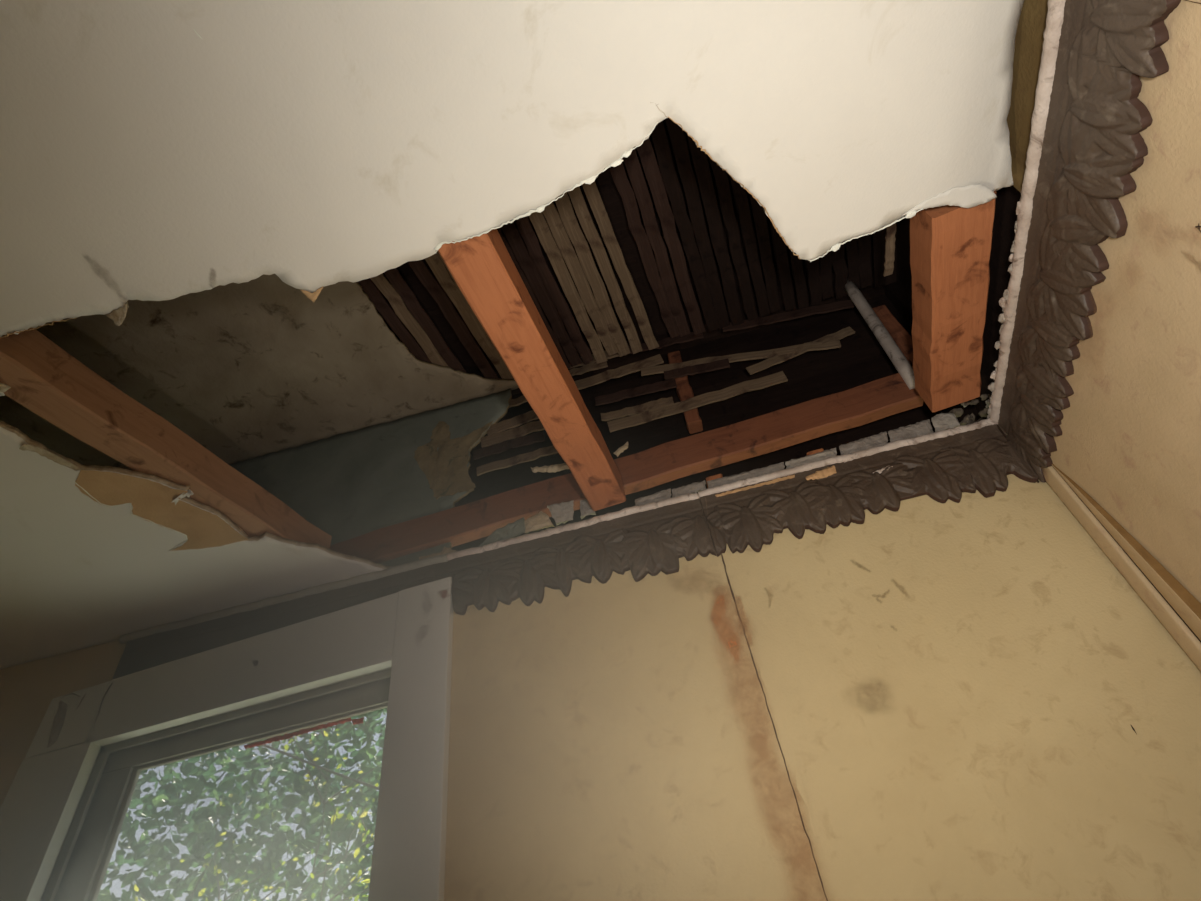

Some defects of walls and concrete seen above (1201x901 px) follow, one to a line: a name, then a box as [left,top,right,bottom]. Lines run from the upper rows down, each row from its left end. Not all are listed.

spalling [434,116,923,262]
spalling [1008,201,1021,273]
peeling [105,303,127,326]
peeling [300,287,323,302]
spalling [987,288,1009,418]
spalling [635,413,960,506]
peeling [75,470,248,551]
spalling [479,499,596,546]
crack [705,498,828,901]